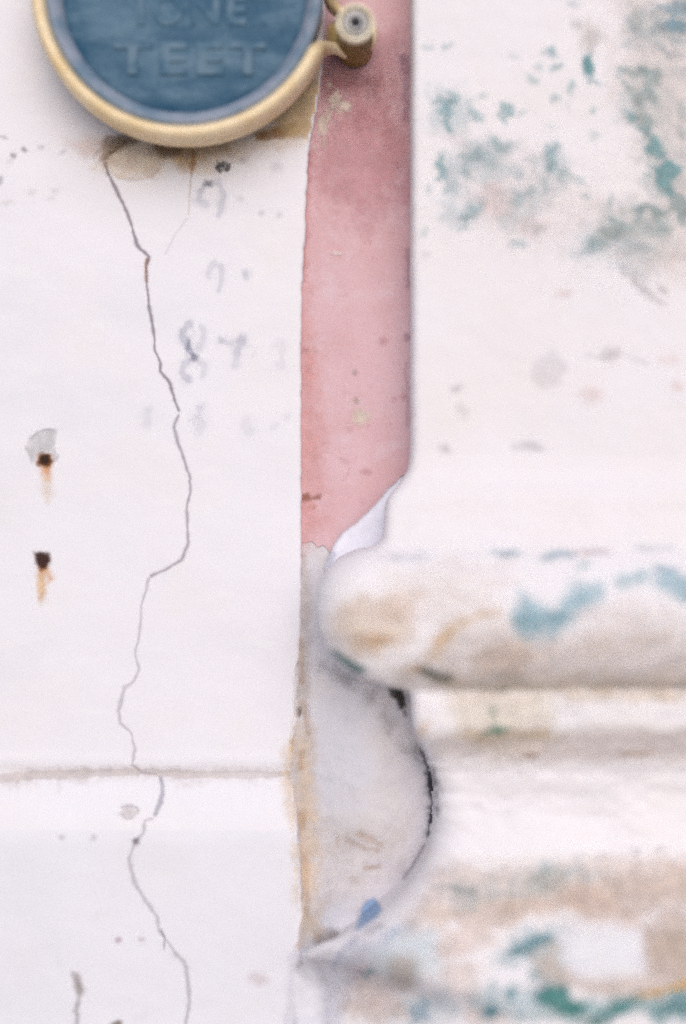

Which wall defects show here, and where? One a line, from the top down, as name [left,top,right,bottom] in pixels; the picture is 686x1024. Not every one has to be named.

damp [257,84,318,140]
damp [105,138,135,153]
corrosion [36,553,50,587]